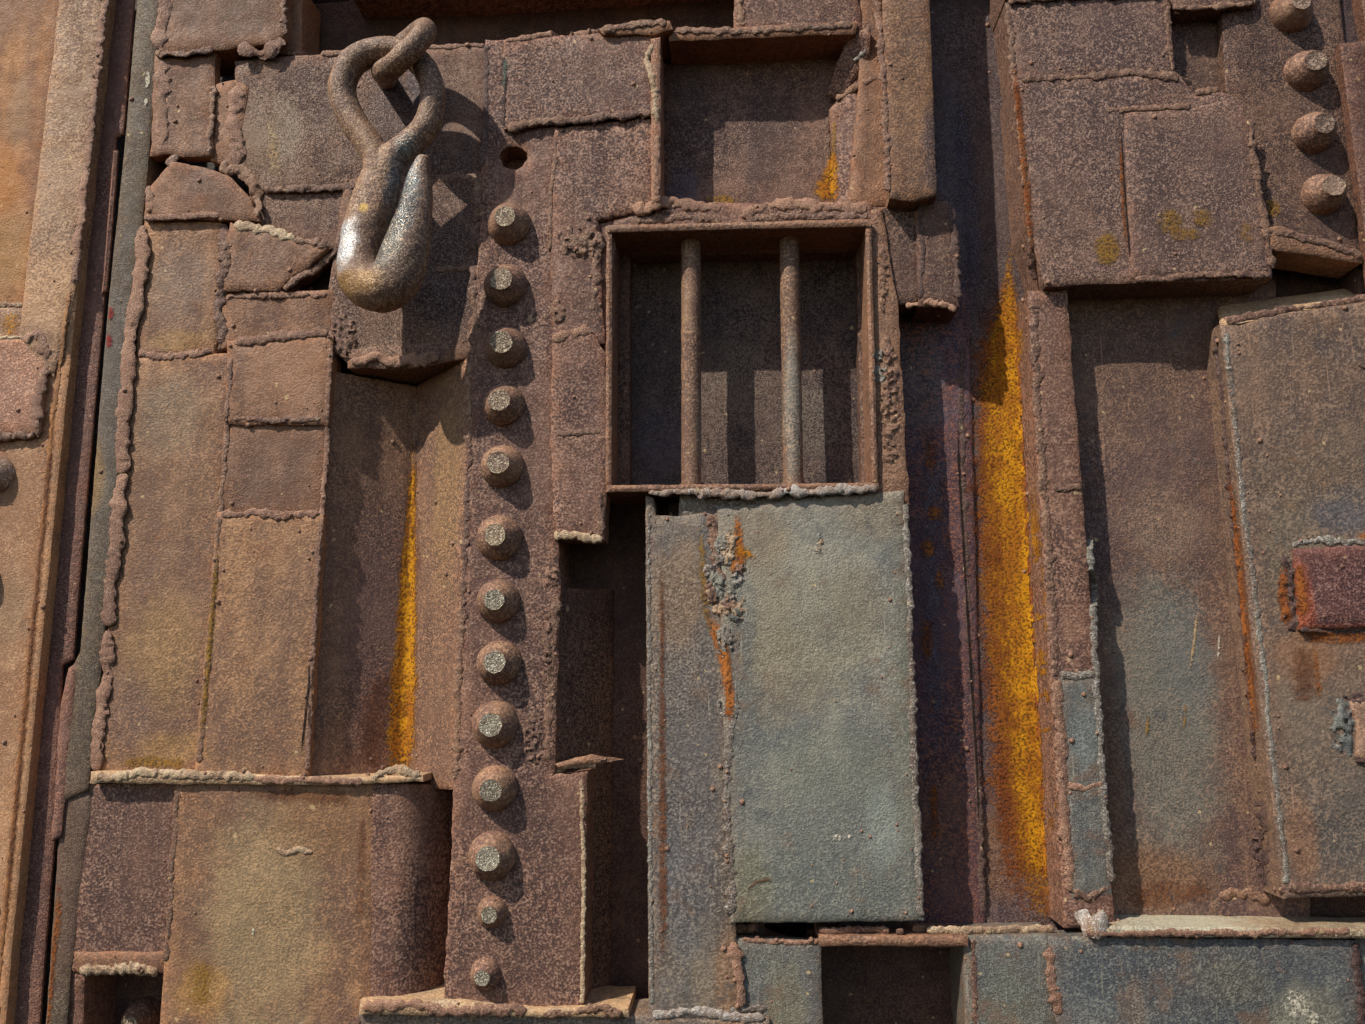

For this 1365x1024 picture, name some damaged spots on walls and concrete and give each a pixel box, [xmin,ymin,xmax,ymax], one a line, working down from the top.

rust [814,123,838,199]
rust [731,515,752,571]
rust [359,466,419,767]
rust [699,536,735,720]
rust [970,259,1056,915]
rust [1277,565,1309,624]
rust [1294,631,1365,699]